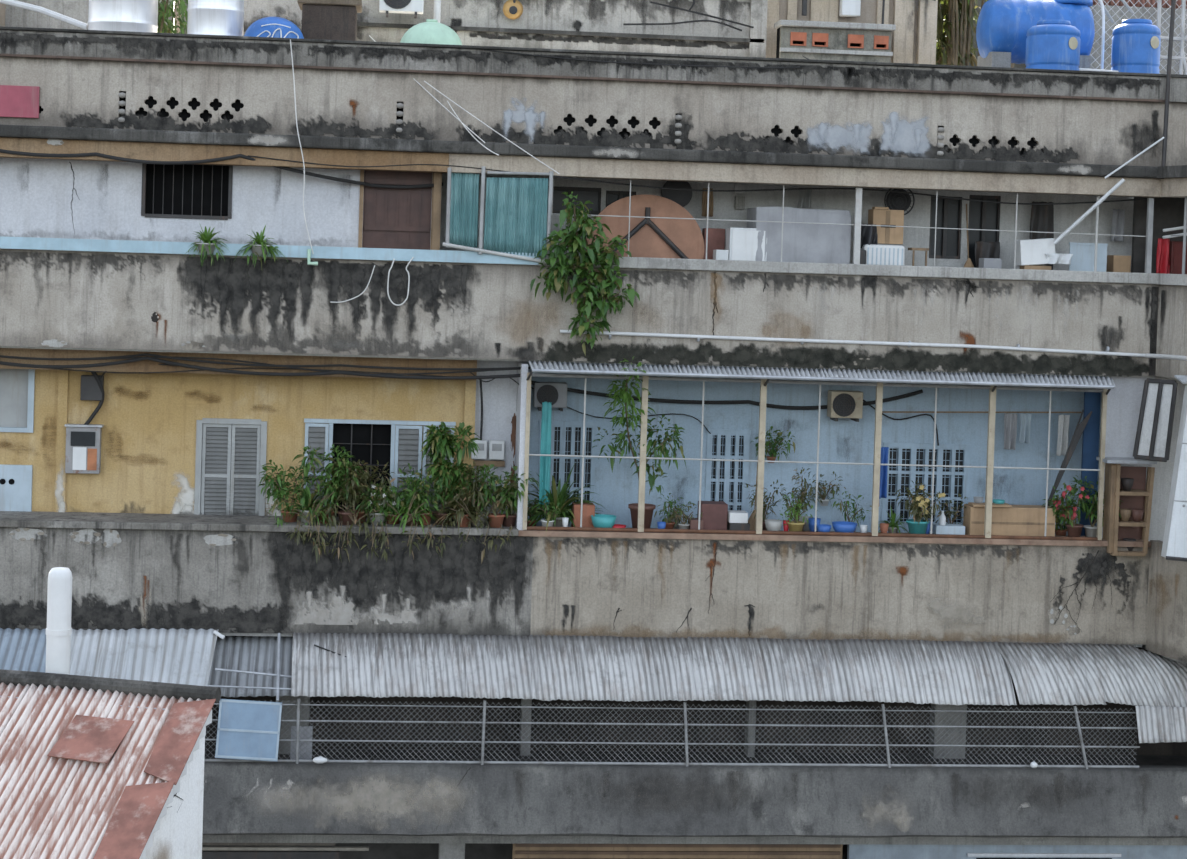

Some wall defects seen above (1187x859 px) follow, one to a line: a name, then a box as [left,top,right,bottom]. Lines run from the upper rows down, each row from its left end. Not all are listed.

water stain [0,0,1160,96]
water stain [177,257,476,357]
crack [711,272,719,335]
water stain [729,274,1013,305]
peeling [172,475,195,514]
water stain [0,596,47,630]
water stain [71,532,681,633]
rust [707,543,720,587]
mould [1053,550,1149,612]